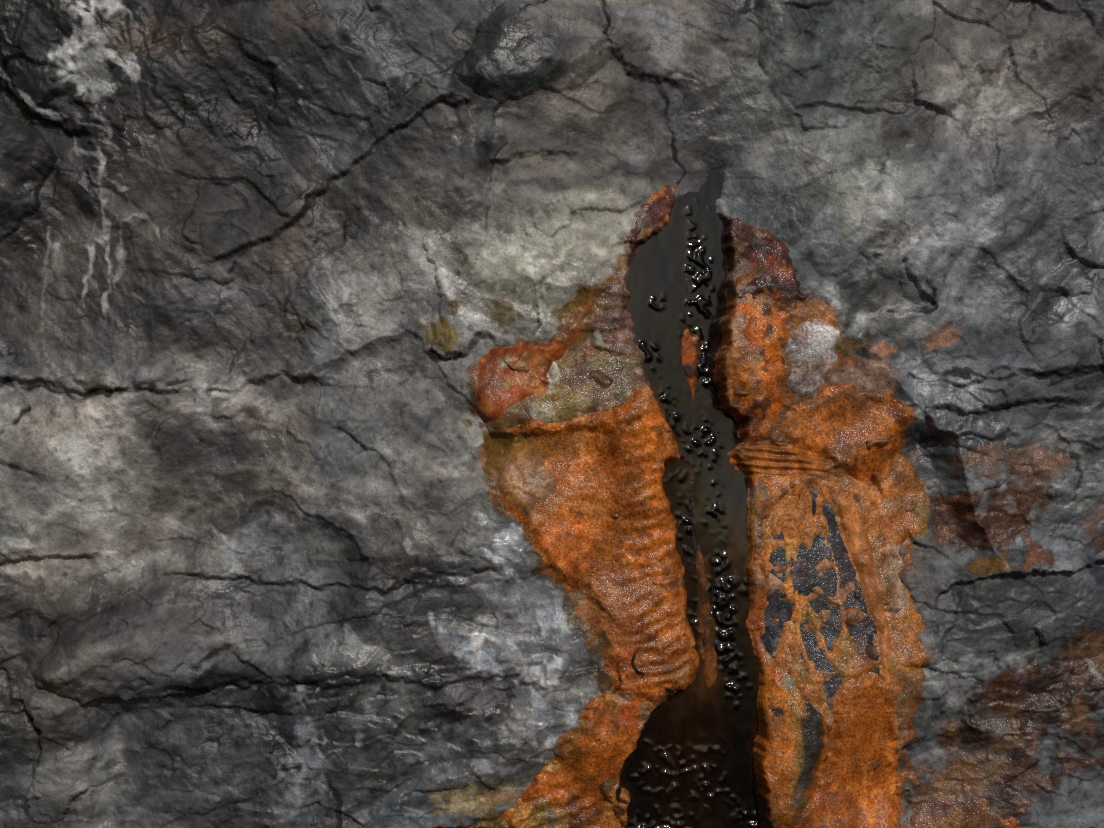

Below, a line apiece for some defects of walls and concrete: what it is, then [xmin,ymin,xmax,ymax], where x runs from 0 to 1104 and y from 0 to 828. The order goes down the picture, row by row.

leakage [48,0,139,102]
rust [418,300,460,355]
rust [430,185,700,828]
rust [714,218,1104,828]